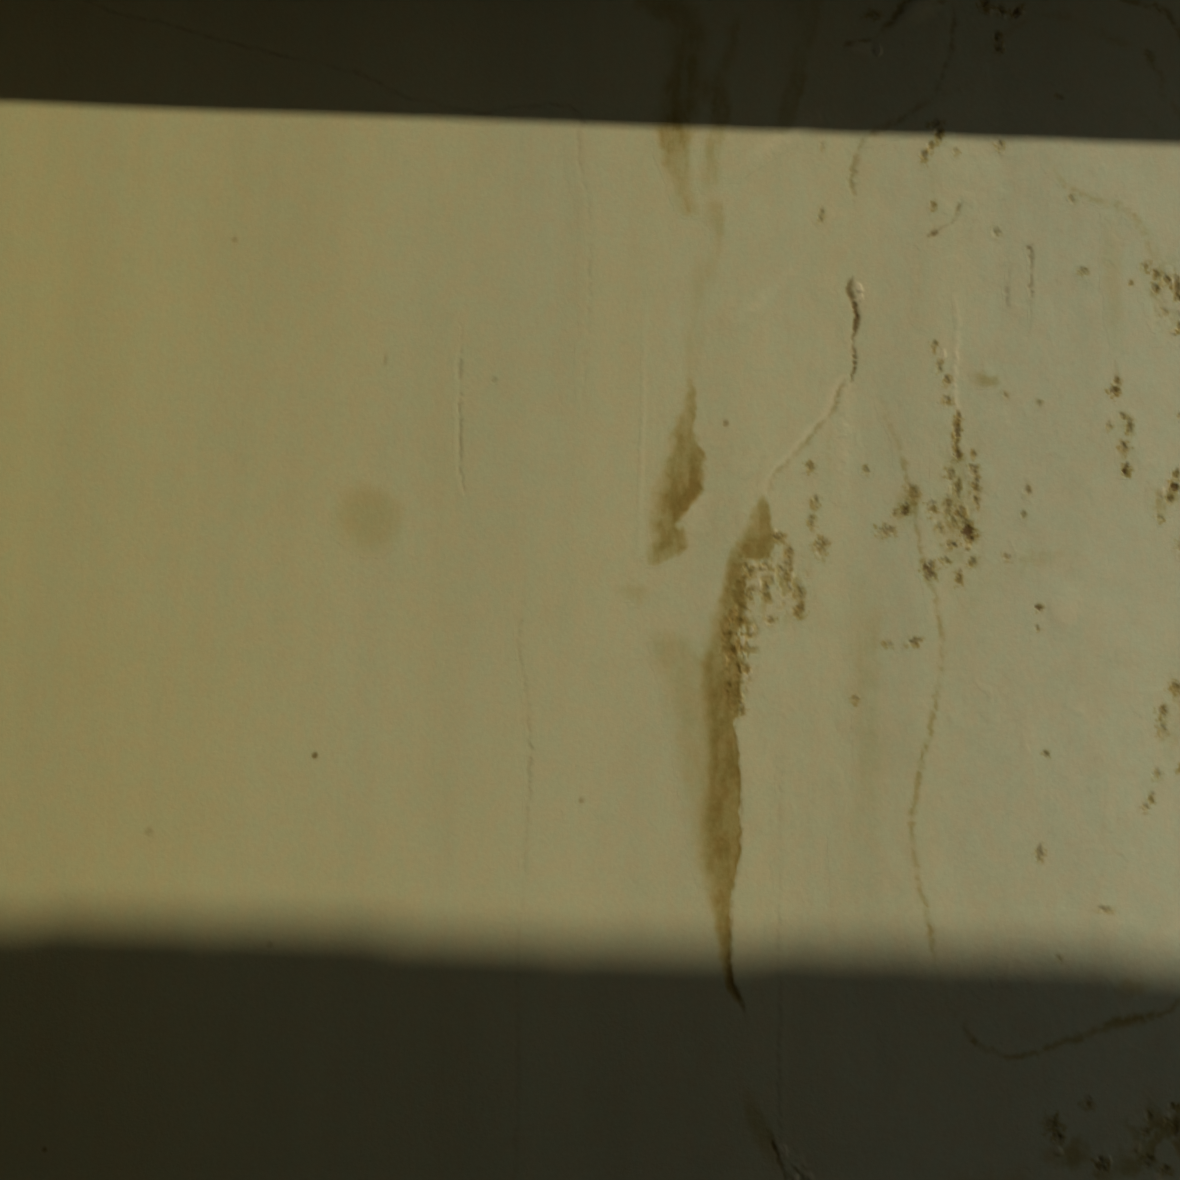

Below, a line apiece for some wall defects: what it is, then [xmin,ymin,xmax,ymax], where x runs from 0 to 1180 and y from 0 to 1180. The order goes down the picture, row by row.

water stain [770,0,826,131]
water stain [613,0,745,609]
crack [757,268,869,503]
flaking render [869,293,1015,622]
flaking render [1102,344,1180,562]
flaking render [1126,236,1180,352]
peeling [646,456,835,1025]
flaking render [879,634,930,652]
crack [958,995,1180,1063]